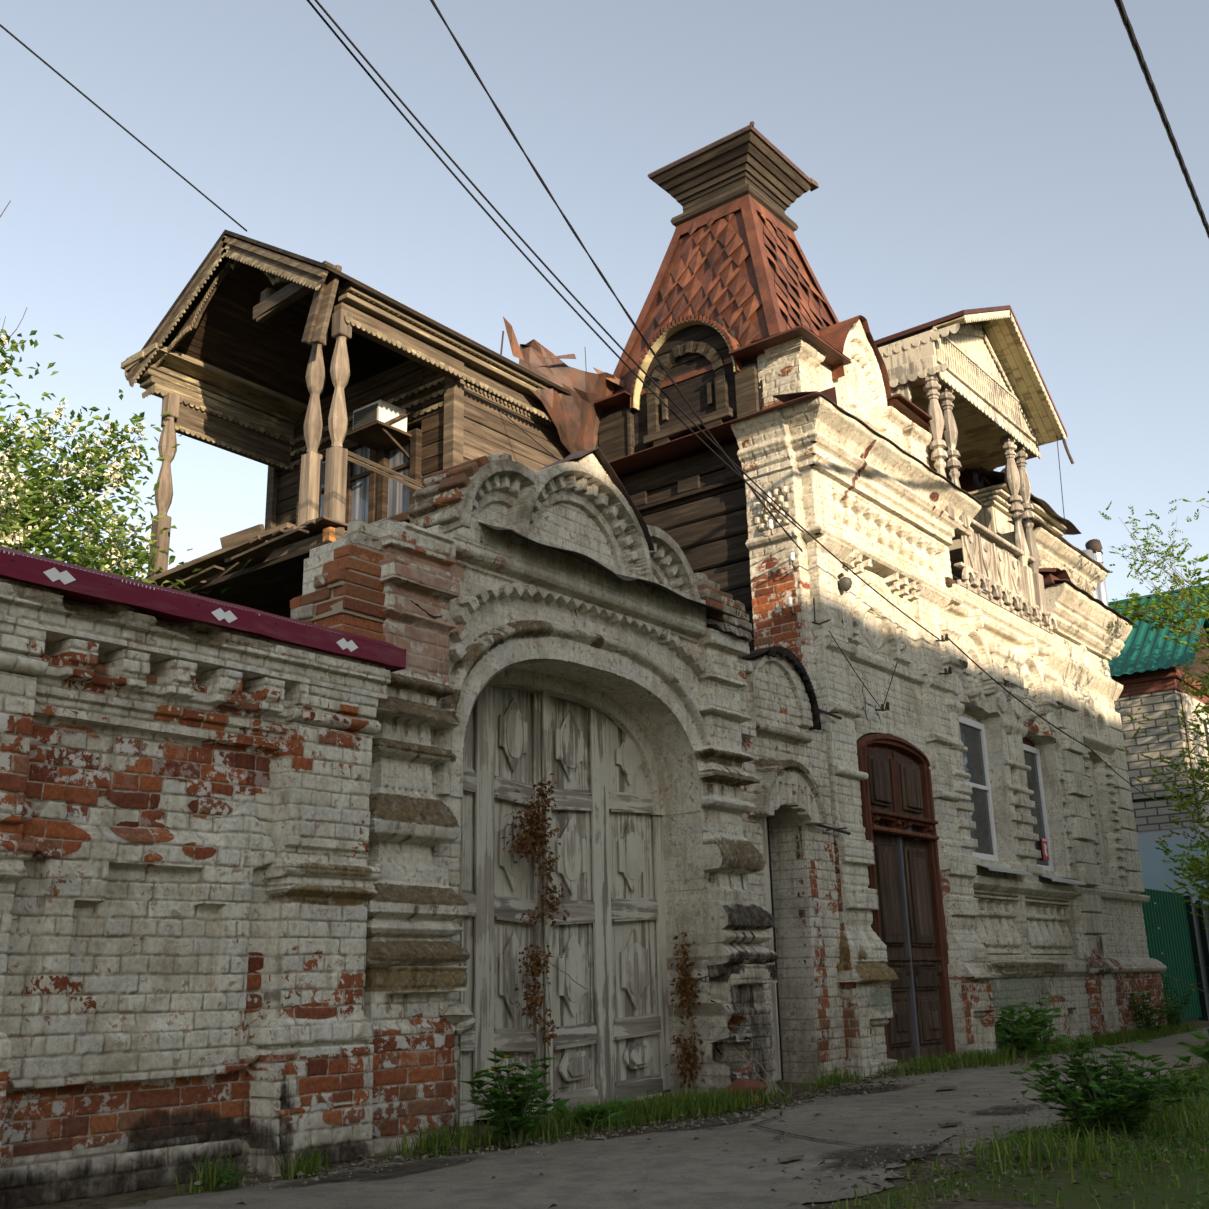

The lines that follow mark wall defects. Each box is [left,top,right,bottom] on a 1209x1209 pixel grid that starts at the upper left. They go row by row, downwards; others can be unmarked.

peeling [350,534,474,682]
peeling [751,557,812,663]
peeling [0,694,316,868]
peeling [331,714,367,725]
peeling [833,831,843,941]
peeling [809,859,852,1065]
peeling [1084,948,1166,1039]
peeling [0,1011,456,1164]